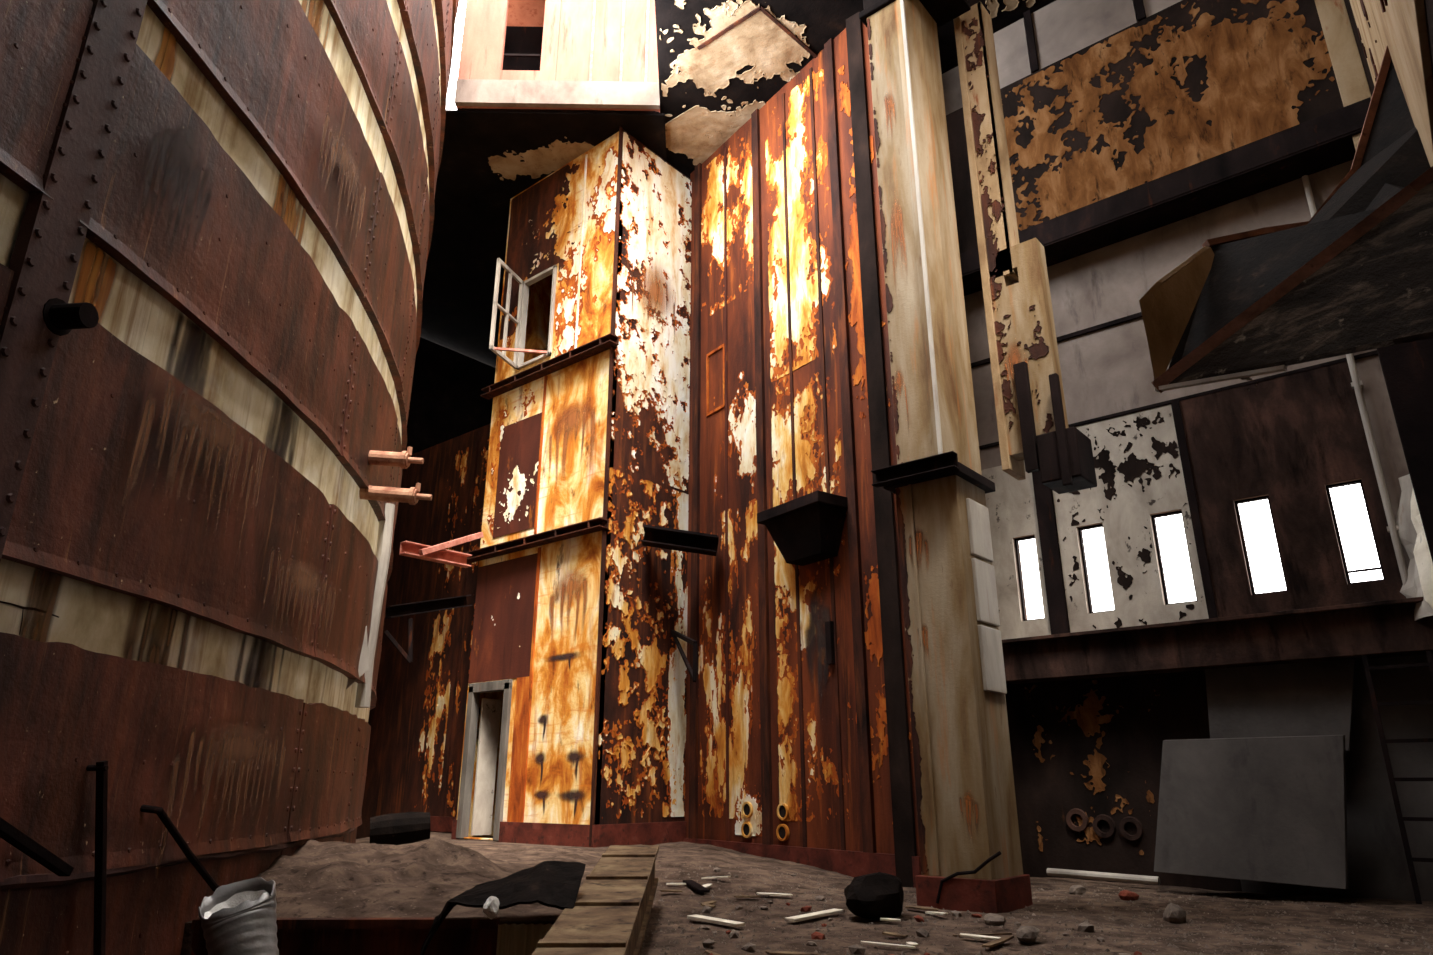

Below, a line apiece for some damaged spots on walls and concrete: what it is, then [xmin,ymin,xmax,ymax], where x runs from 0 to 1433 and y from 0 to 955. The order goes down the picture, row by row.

peeling [962,0,1335,242]
peeling [989,269,1049,360]
corrosion [125,378,267,539]
corrosion [549,405,595,471]
peeling [488,0,880,836]
peeling [1057,412,1180,541]
corrosion [124,600,191,669]
corrosion [549,653,577,669]
corrosion [549,572,587,635]
peeling [1068,556,1079,602]
peeling [1112,519,1152,600]
corrosion [535,715,584,816]